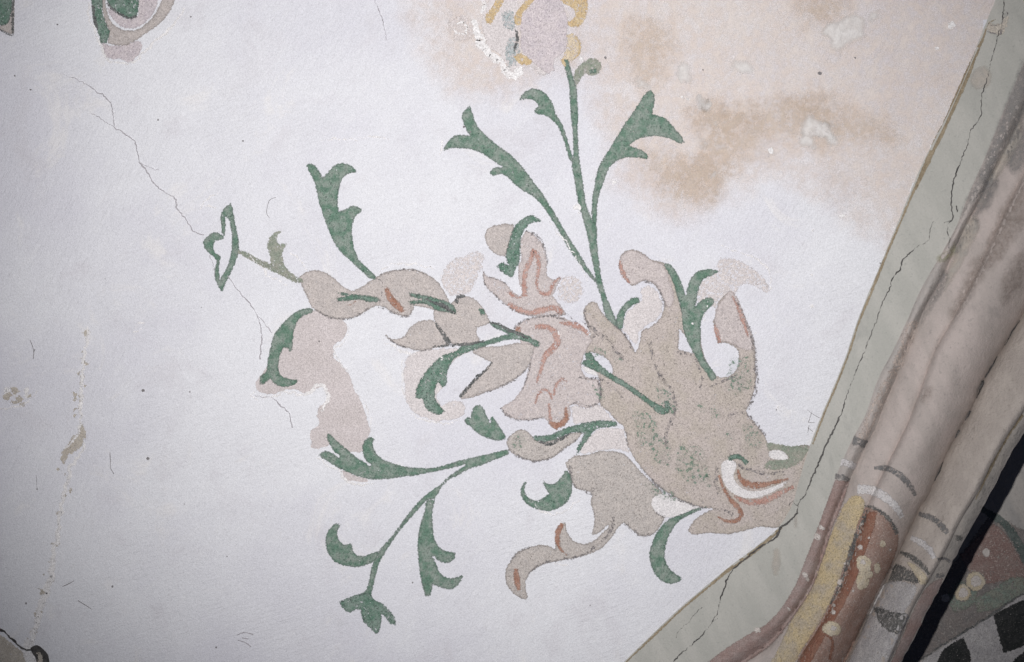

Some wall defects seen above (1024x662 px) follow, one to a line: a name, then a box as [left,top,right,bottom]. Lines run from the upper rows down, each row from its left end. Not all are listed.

crack [63,74,272,359]
peeling [448,0,546,80]
leakage [575,0,995,231]
crack [674,2,1005,661]
peeling [0,327,89,662]